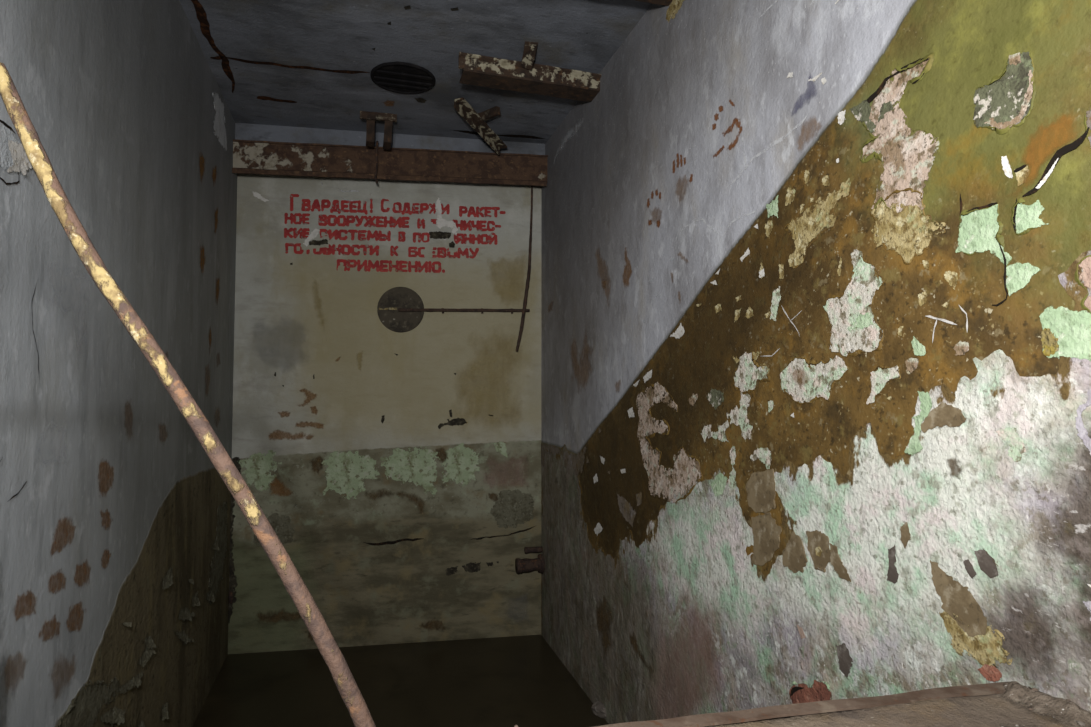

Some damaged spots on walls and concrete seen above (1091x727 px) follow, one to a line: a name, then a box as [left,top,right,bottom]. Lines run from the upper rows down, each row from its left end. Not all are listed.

crack [191,0,370,103]
spalling [0,122,32,175]
peeling [837,51,1058,296]
peeling [734,170,851,323]
corrosion [99,461,114,495]
peeling [232,450,282,492]
peeling [490,249,1091,724]
corrosion [51,518,76,554]
corrosion [49,550,111,593]
corrosion [15,591,36,620]
corrosion [39,603,83,641]
peeling [55,635,157,727]